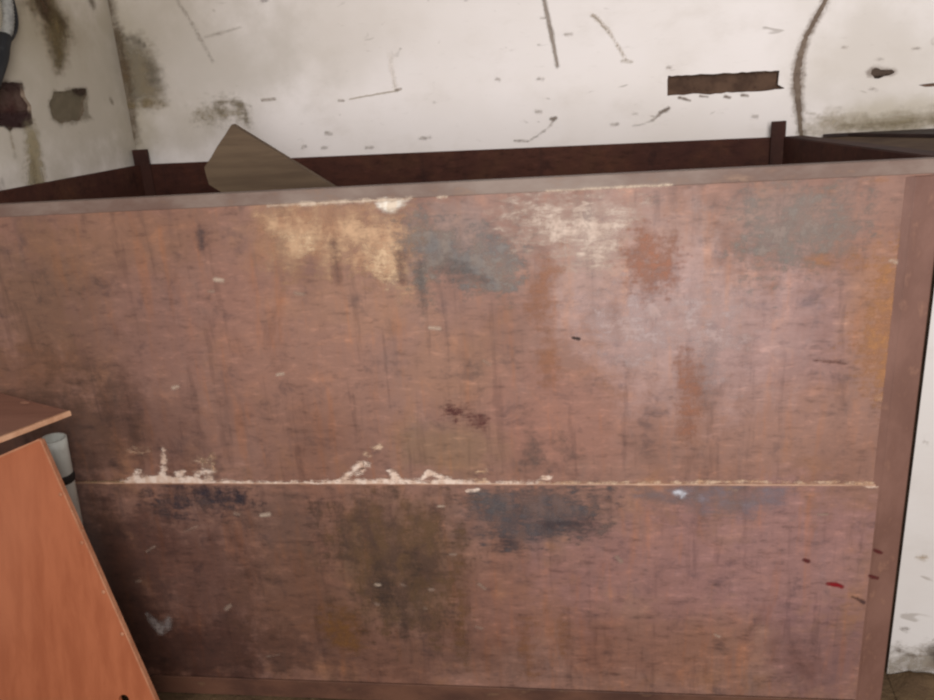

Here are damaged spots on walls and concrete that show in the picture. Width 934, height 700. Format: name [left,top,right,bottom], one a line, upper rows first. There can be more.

damp [30,0,69,67]
crack [543,0,558,67]
spalling [0,82,33,131]
spalling [49,88,87,123]
damp [108,0,162,138]
damp [198,101,247,121]
crack [342,89,399,101]
spalling [871,68,894,79]